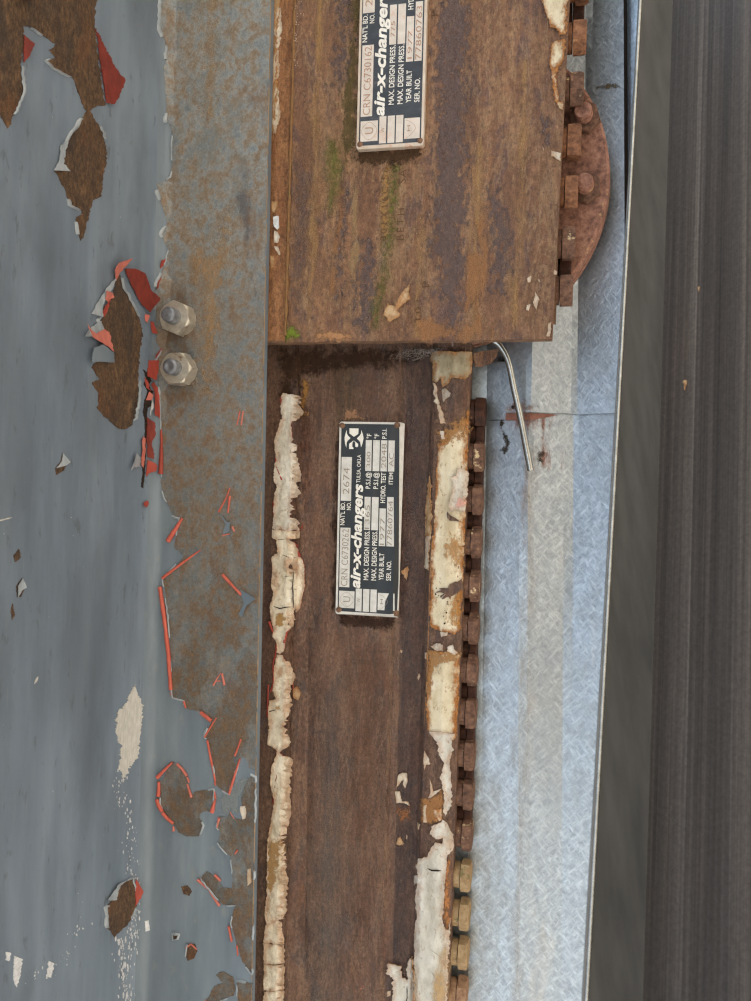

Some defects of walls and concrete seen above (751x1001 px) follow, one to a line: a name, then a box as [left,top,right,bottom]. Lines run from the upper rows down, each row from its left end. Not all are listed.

peeling [0,0,125,241]
corrosion [315,166,391,343]
corrosion [415,0,520,346]
peeling [541,0,569,110]
peeling [430,351,473,439]
peeling [86,0,306,1001]
corrosion [429,410,472,635]
peeling [425,632,458,659]
corrosion [425,650,462,740]
peeling [386,731,455,1001]
corrosion [397,790,445,824]